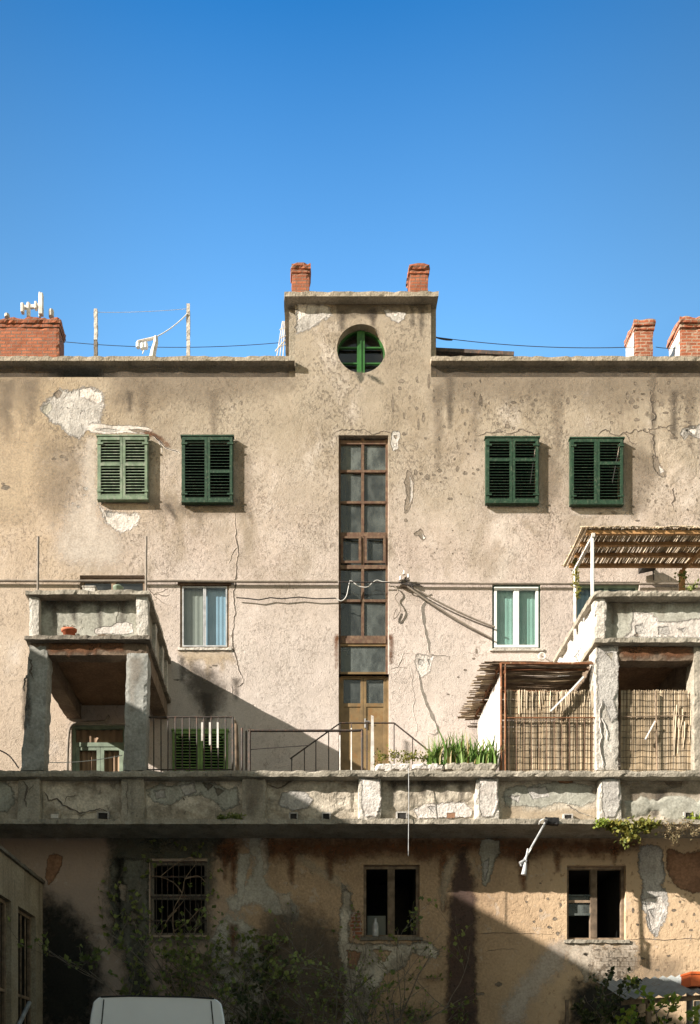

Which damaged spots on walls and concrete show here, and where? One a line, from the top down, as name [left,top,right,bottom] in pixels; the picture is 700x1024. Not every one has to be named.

peeling [39,386,146,566]
crack [598,381,683,509]
crack [229,513,244,694]
crack [393,599,450,737]
leakage [259,838,481,1024]
peeling [337,884,439,1024]
leakage [495,838,639,889]
peeling [632,844,700,937]